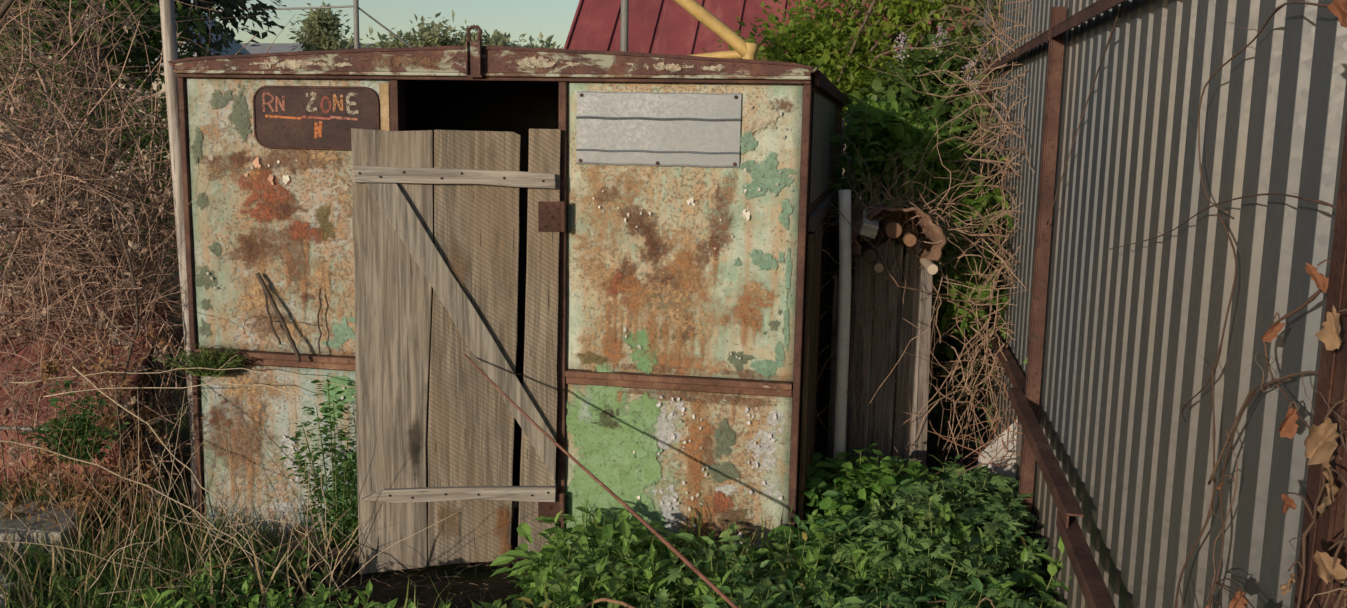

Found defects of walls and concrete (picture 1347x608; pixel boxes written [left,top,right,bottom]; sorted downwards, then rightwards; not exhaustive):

peeling [514,55,580,69]
peeling [627,62,725,71]
rust [198,123,349,342]
rust [567,164,775,379]
peeling [565,363,786,549]
rust [618,389,771,545]